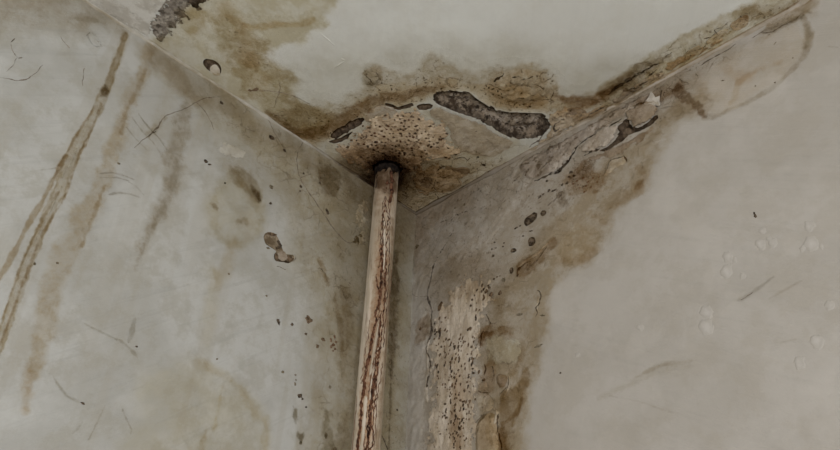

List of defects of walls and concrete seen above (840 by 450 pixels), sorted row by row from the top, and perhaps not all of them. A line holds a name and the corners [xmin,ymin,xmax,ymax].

peeling [89,0,212,42]
flaking render [203,59,221,76]
flaking render [329,15,749,195]
water stain [364,154,417,212]
peeling [264,232,296,270]
crack [412,233,452,403]